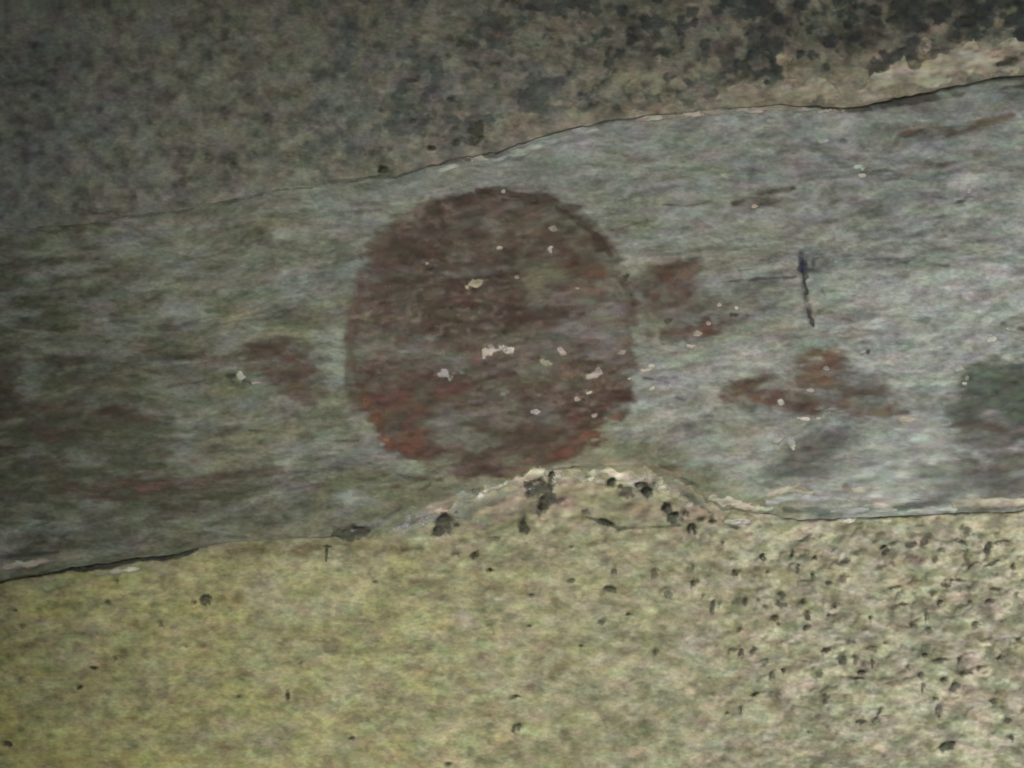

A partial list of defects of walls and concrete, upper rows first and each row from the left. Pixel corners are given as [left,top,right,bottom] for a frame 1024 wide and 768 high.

crack [633,92,963,122]
crack [431,127,601,171]
crack [284,173,405,189]
crack [734,256,824,327]
rust [345,188,719,478]
rust [720,349,879,421]
spalling [403,458,1024,541]
spalling [331,523,370,541]
crack [0,549,199,583]